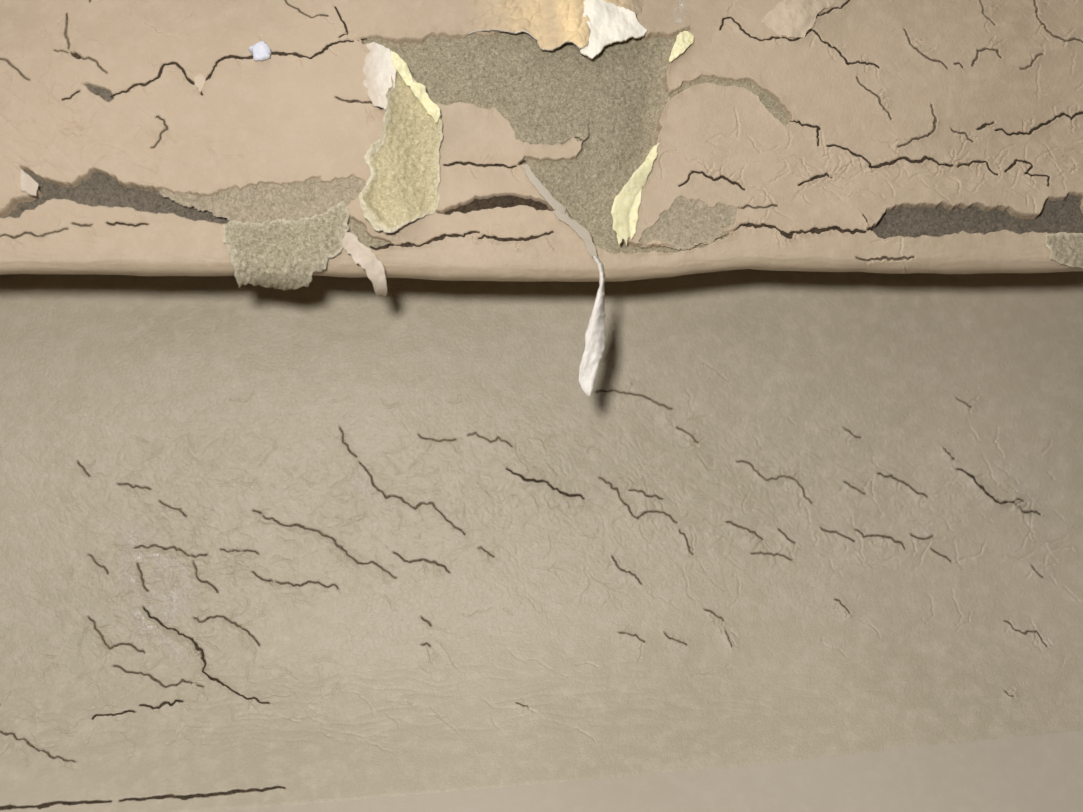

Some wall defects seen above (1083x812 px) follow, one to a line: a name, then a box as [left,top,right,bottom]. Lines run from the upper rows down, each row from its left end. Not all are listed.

crack [54,0,367,98]
peeling [762,0,837,39]
crack [719,0,892,120]
crack [827,104,1083,187]
peeling [0,0,741,396]
crack [678,171,914,261]
peeling [871,194,1083,268]
crack [253,510,450,579]
crack [339,427,495,557]
crack [418,432,693,555]
crack [737,460,951,562]
crack [88,544,339,719]